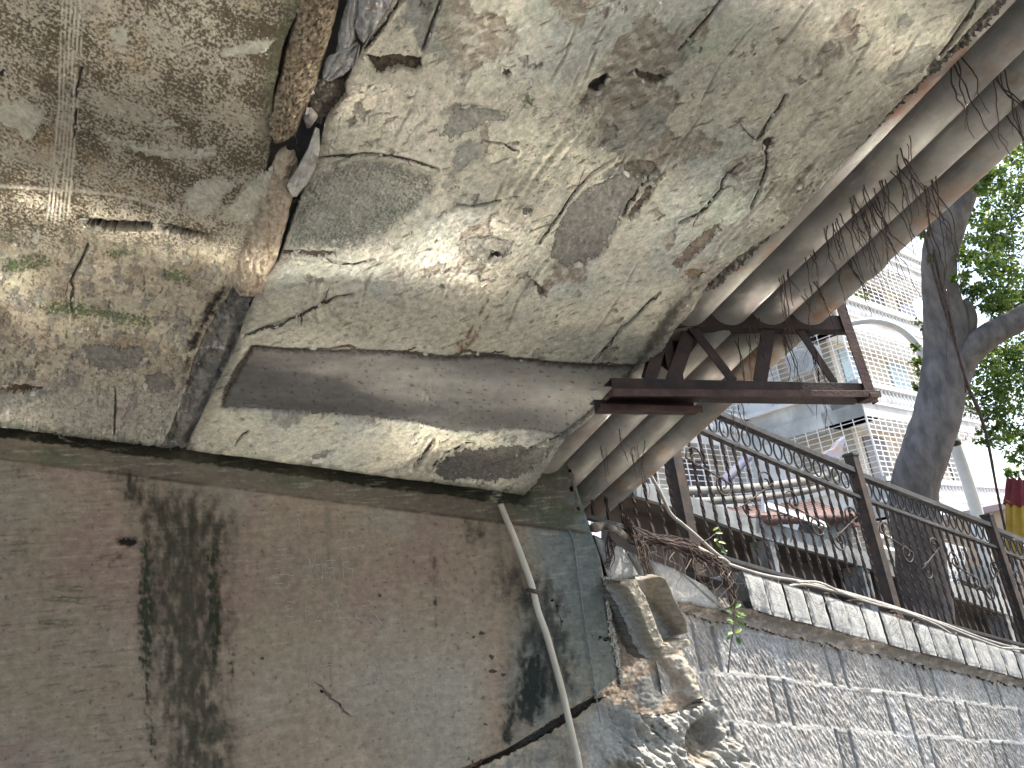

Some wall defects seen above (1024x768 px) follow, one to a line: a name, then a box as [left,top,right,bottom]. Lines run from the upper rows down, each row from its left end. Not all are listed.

peeling [439,104,505,139]
spalling [588,73,611,97]
crack [739,95,785,205]
crack [539,160,610,241]
peeling [551,160,657,268]
crack [623,176,649,216]
peeling [672,225,724,281]
crack [680,164,738,226]
crack [222,258,659,406]
peeling [435,445,551,484]
water stain [127,476,233,768]
water stain [503,581,574,744]